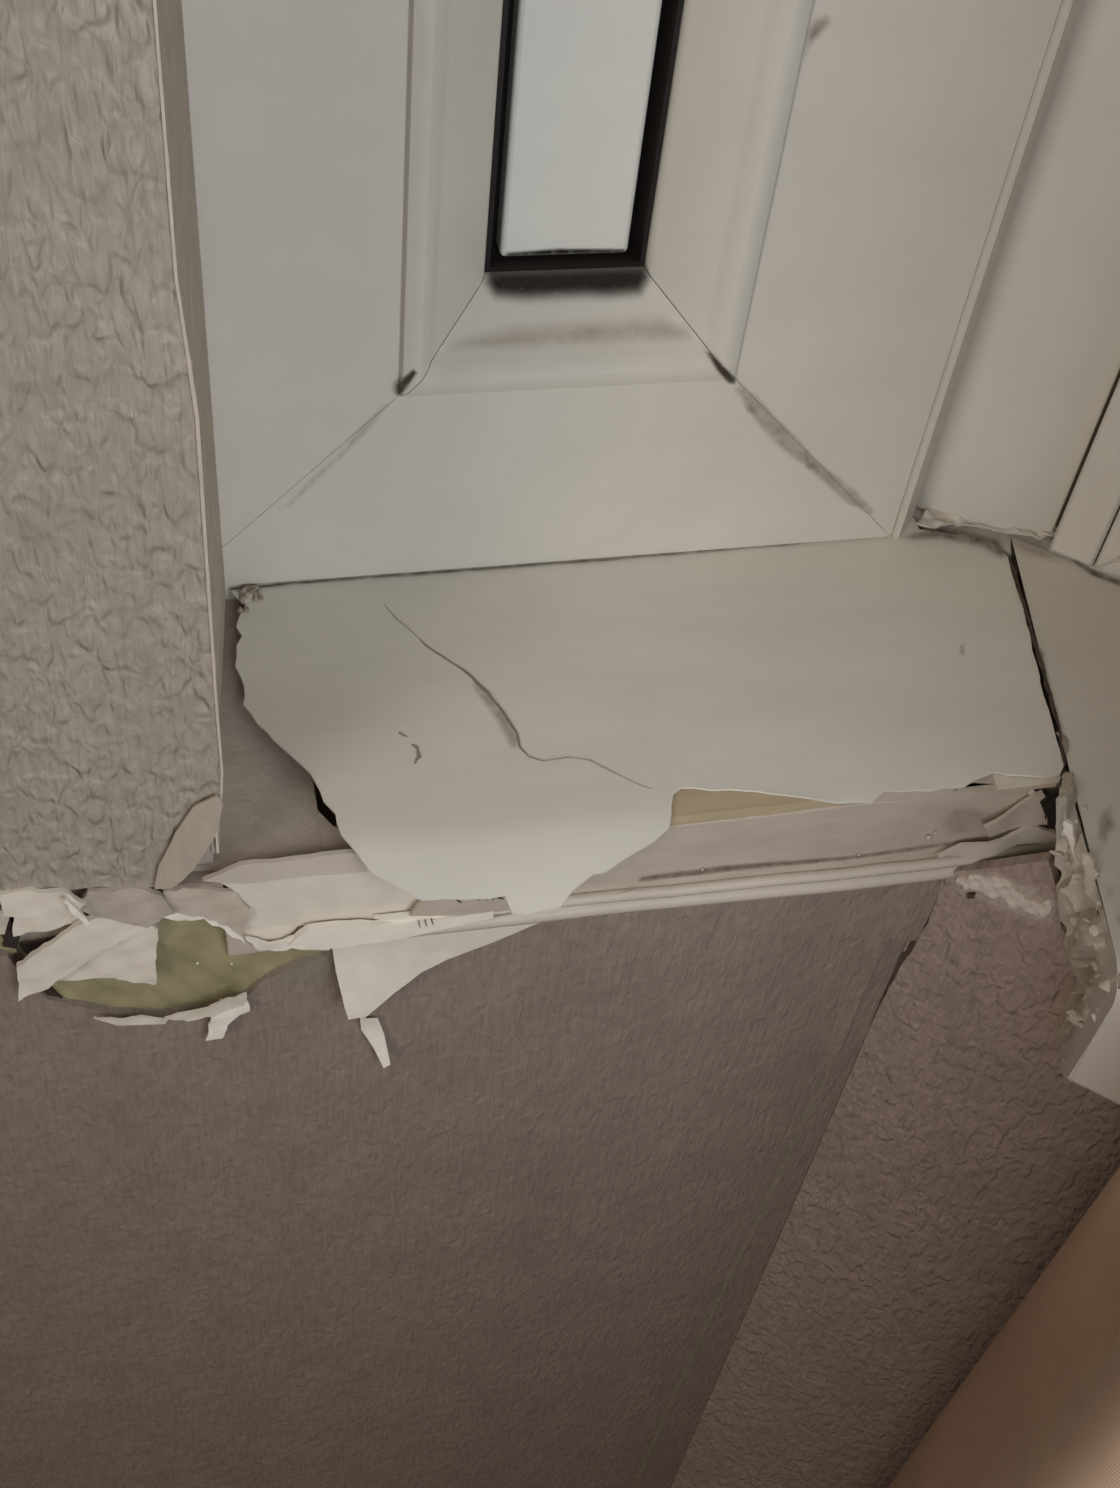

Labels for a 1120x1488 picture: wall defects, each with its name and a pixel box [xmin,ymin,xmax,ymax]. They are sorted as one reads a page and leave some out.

crack [384,604,652,790]
crack [1009,558,1069,766]
spalling [0,885,329,1041]
spalling [953,771,1120,1084]